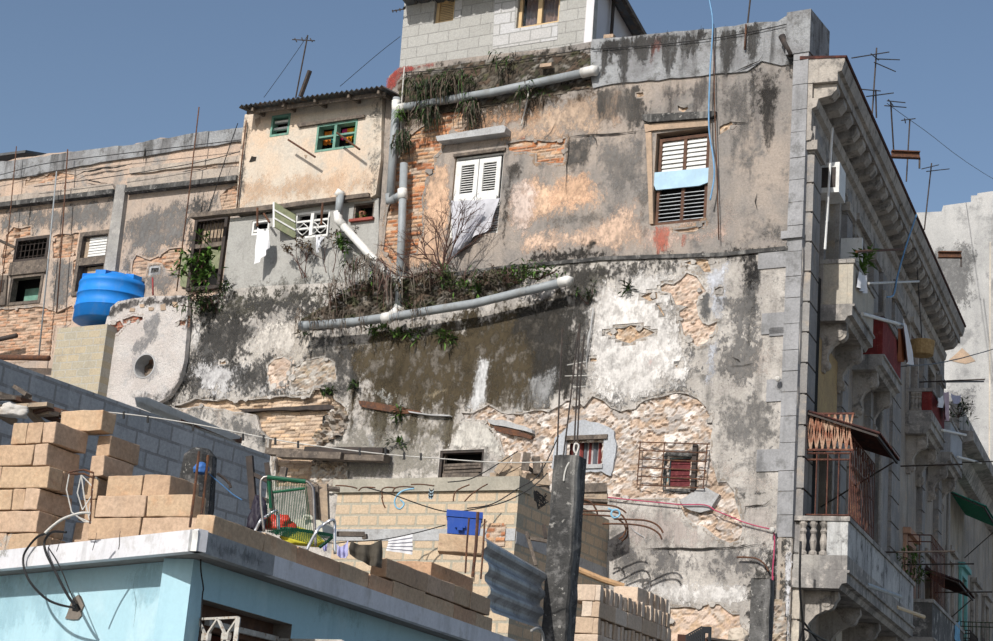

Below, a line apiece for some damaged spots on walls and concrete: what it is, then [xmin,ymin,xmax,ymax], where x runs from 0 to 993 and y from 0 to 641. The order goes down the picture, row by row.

spalling [0,224,33,275]
spalling [51,233,79,270]
spalling [381,111,468,266]
spalling [504,135,569,166]
damp [467,28,707,202]
damp [720,21,793,155]
spalling [0,304,74,364]
damp [109,267,359,448]
spalling [176,352,347,494]
damp [291,239,688,479]
spalling [463,257,746,546]